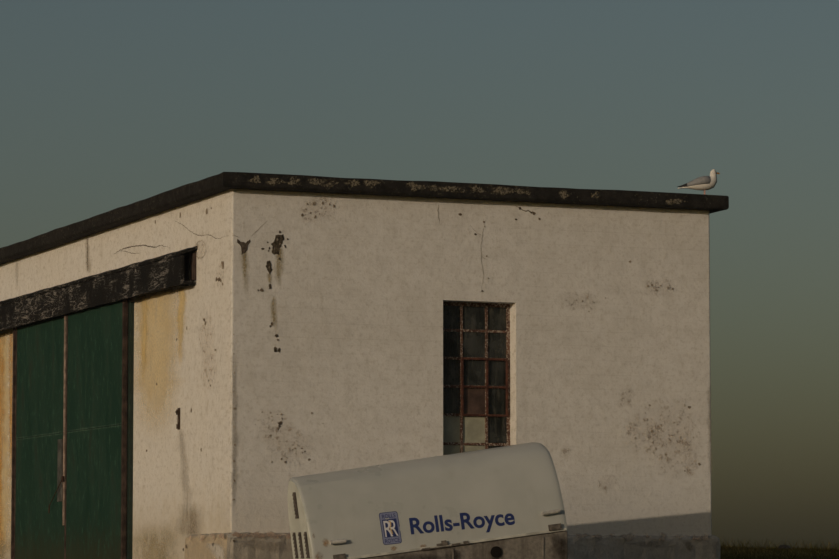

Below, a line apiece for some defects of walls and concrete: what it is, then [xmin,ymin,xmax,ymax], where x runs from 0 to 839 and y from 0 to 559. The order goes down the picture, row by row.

crack [175,221,266,239]
crack [116,245,170,254]
corrosion [0,334,12,505]